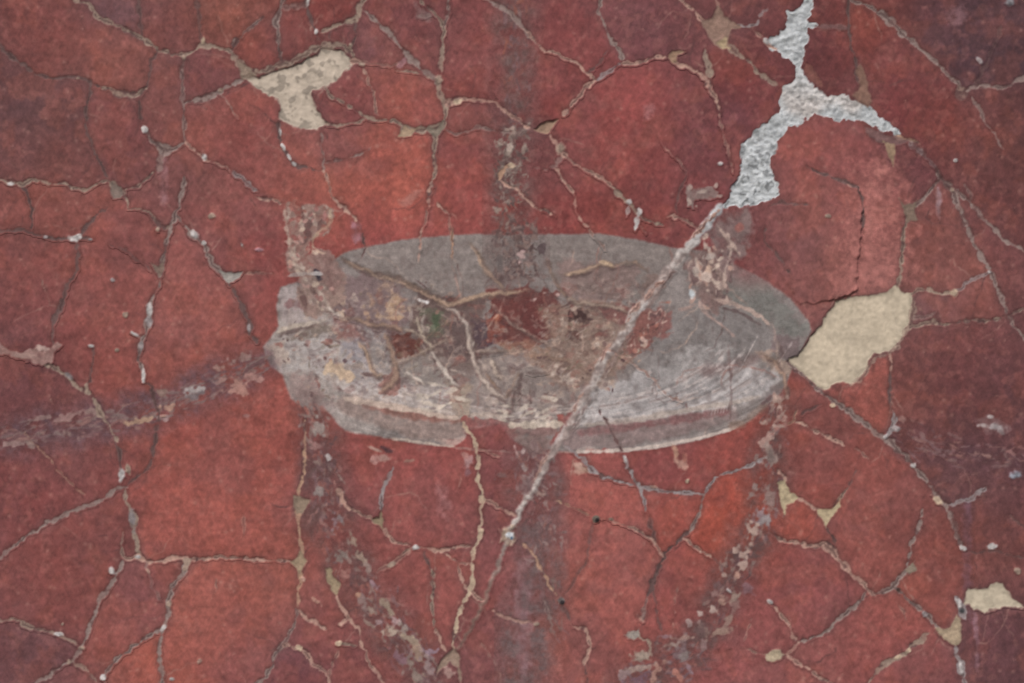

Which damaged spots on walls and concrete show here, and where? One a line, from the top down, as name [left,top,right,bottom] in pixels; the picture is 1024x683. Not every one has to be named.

flaking render [246,40,356,131]
crack [845,0,1024,151]
crack [0,0,780,683]
crack [762,198,810,276]
crack [804,164,867,229]
peeling [788,143,928,431]
crack [895,140,1024,342]
crack [741,352,1024,683]
flaking render [963,581,1024,615]